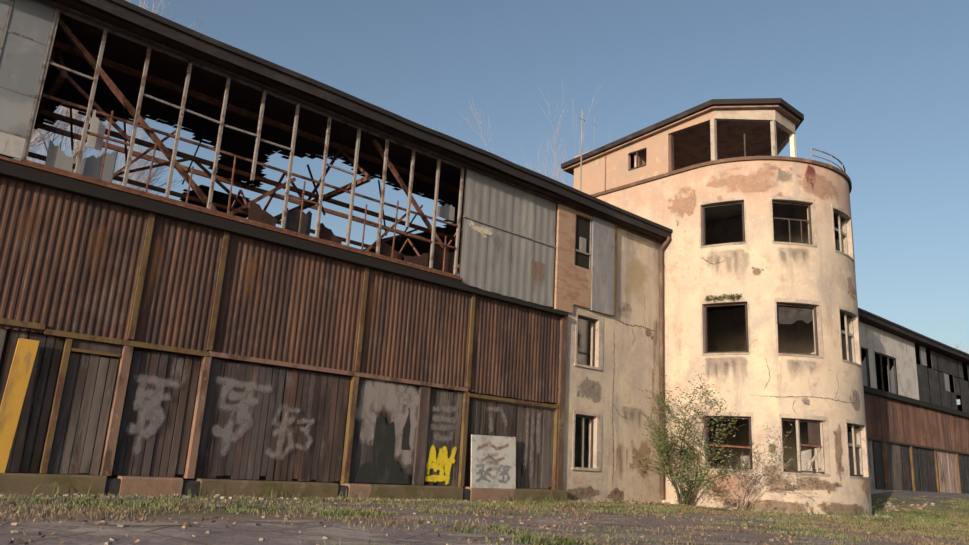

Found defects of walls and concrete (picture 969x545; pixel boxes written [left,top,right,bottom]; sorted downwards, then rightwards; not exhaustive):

peeling [668,188,696,226]
peeling [709,163,837,200]
crack [612,320,654,491]
crack [759,360,854,412]